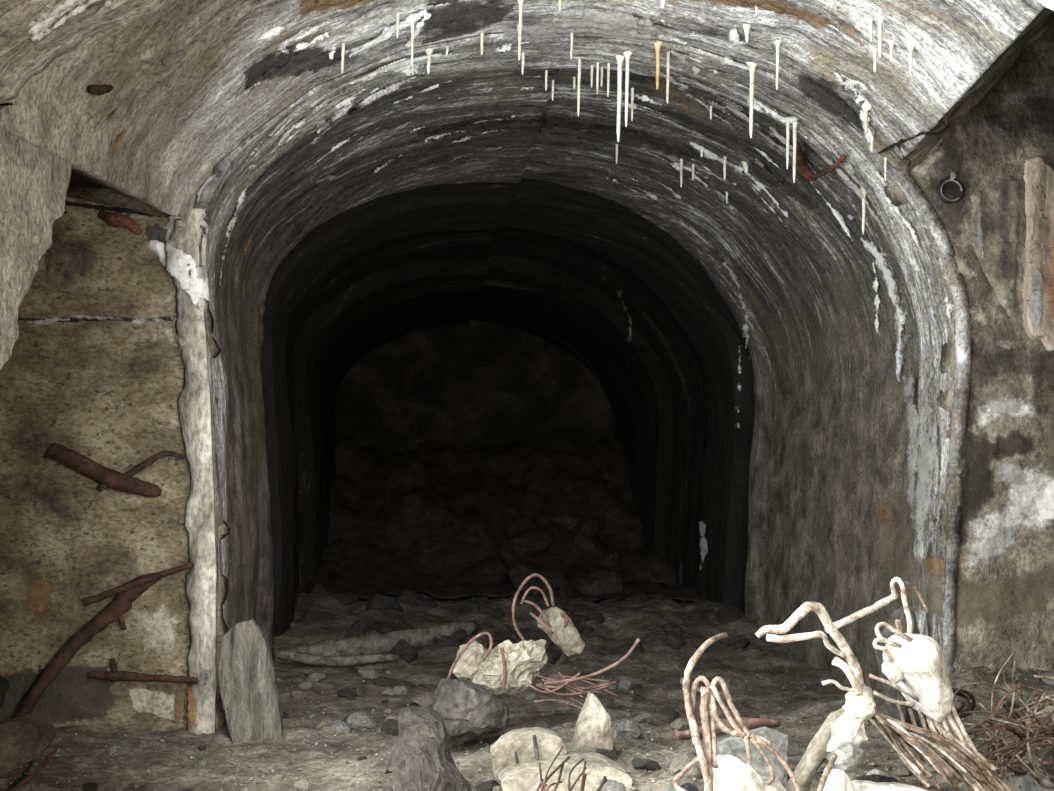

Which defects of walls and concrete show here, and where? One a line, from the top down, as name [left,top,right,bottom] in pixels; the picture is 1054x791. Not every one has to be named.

spalling [913,150,943,175]
spalling [146,160,215,314]
water stain [220,0,939,540]
peeling [956,155,1054,352]
crack [18,315,176,325]
peeling [978,398,1039,427]
water stain [959,398,1034,544]
water stain [699,521,708,569]
corrosion [174,683,197,726]